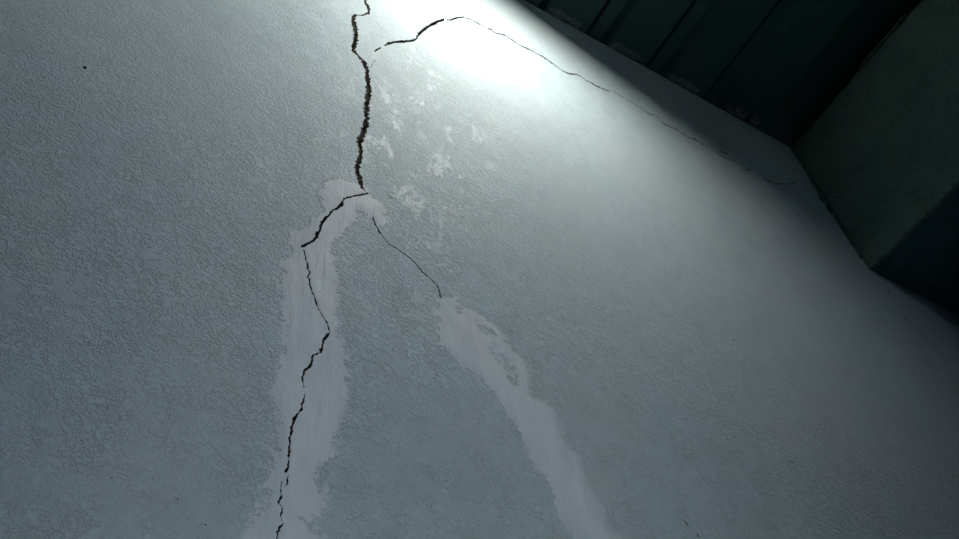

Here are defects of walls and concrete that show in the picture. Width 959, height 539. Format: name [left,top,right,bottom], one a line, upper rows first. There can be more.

crack [276,0,796,539]